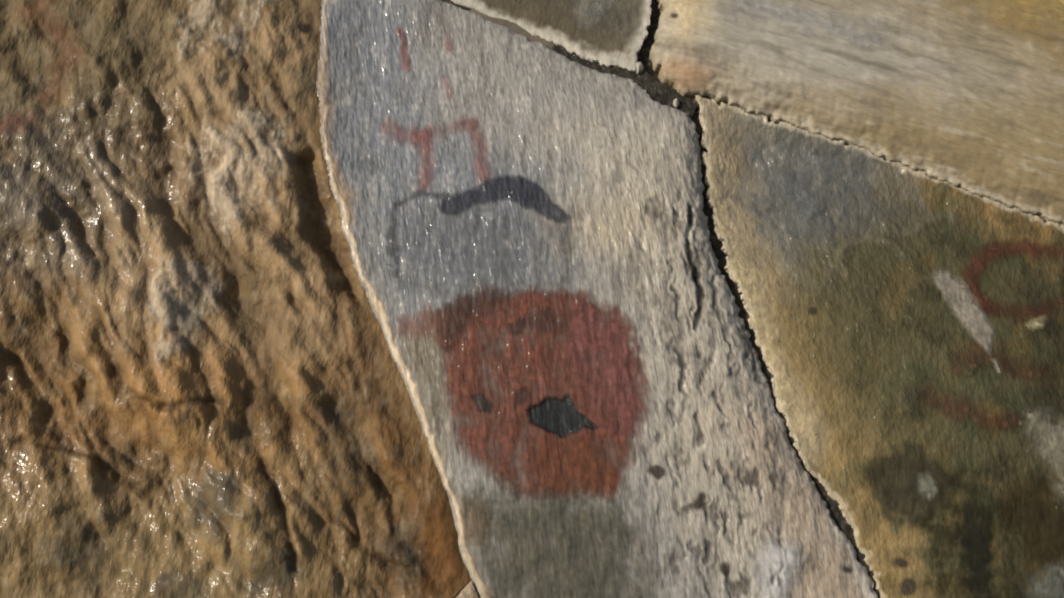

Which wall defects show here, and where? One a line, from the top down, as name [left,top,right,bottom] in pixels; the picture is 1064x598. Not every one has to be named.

crack [442,0,471,11]
leakage [319,0,650,598]
crack [552,0,880,598]
leakage [866,443,1064,598]